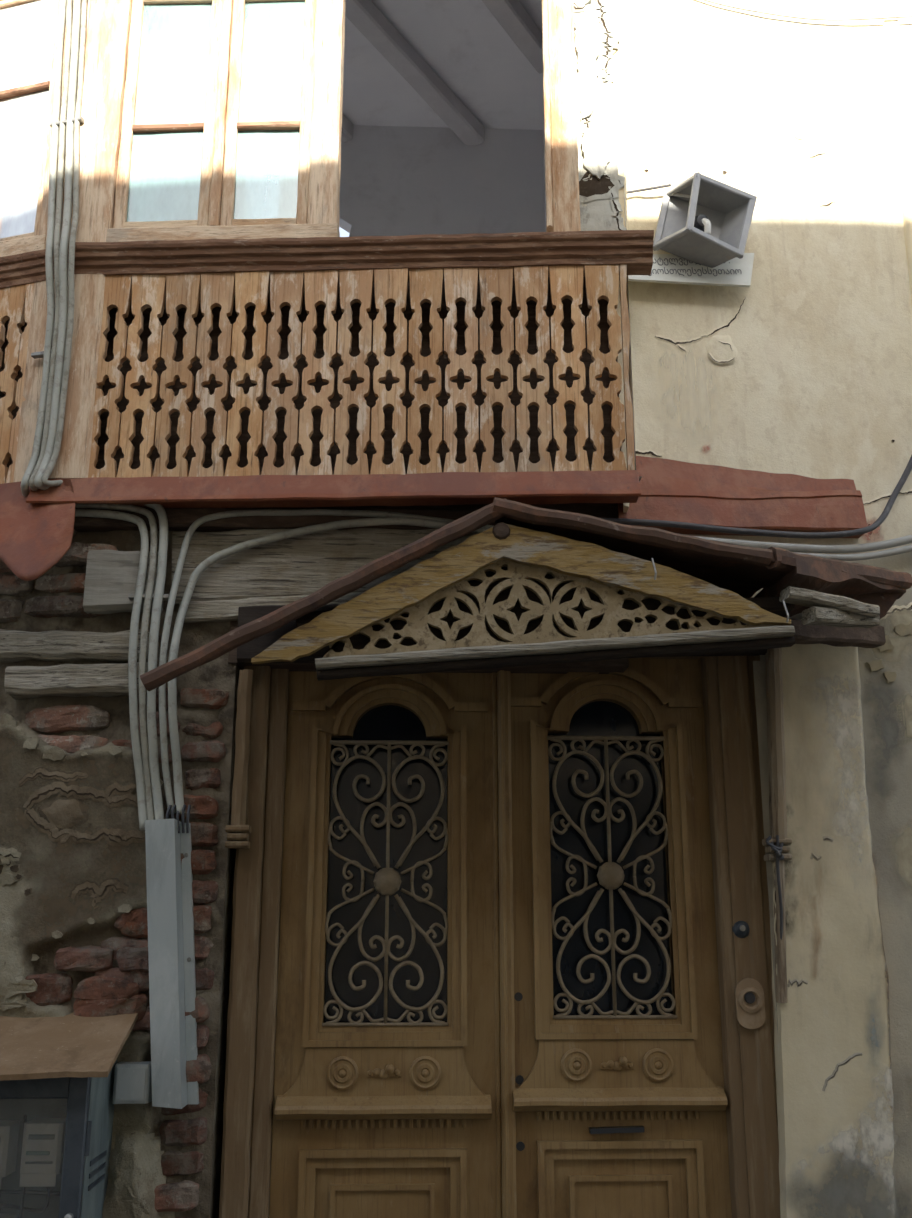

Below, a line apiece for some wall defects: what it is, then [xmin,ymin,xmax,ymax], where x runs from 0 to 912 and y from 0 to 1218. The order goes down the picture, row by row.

peeling [574,0,627,231]
crack [654,296,747,353]
spalling [0,529,118,623]
spalling [867,610,912,683]
spalling [0,688,229,1218]
crack [822,682,891,1091]
leakage [795,1071,911,1218]